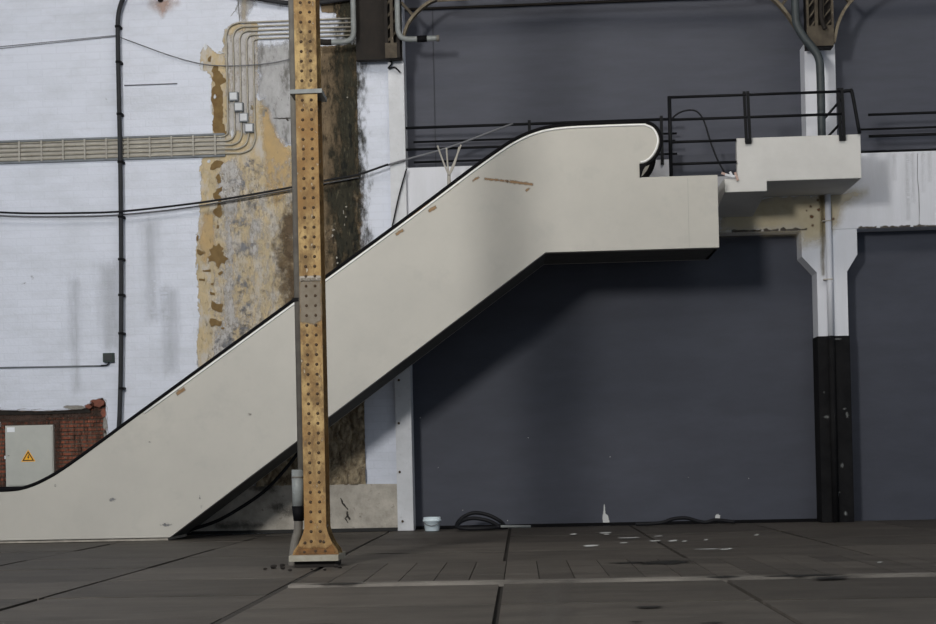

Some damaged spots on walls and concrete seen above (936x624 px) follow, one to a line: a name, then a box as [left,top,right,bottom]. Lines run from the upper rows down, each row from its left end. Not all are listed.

spalling [321,2,341,18]
spalling [321,45,359,189]
peeling [195,23,293,368]
corrosion [295,545,336,555]